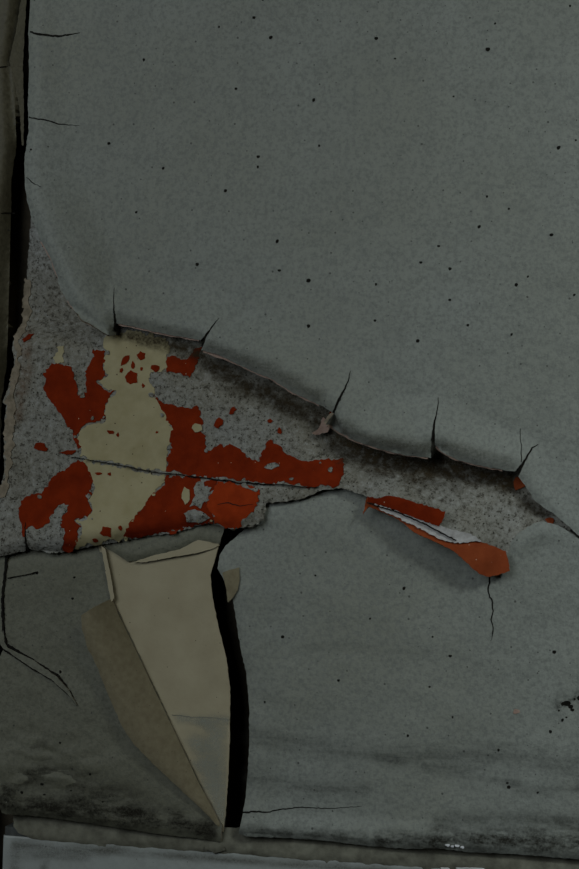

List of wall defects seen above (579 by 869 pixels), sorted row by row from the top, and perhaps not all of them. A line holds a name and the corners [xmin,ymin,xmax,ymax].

crack [30,30,78,38]
crack [29,117,79,126]
flaking render [0,0,579,577]
crack [74,457,318,506]
crack [0,522,77,706]
peeling [223,568,240,602]
crack [486,577,494,640]
peeling [81,546,220,827]
water stain [0,787,215,839]
water stain [412,833,579,852]